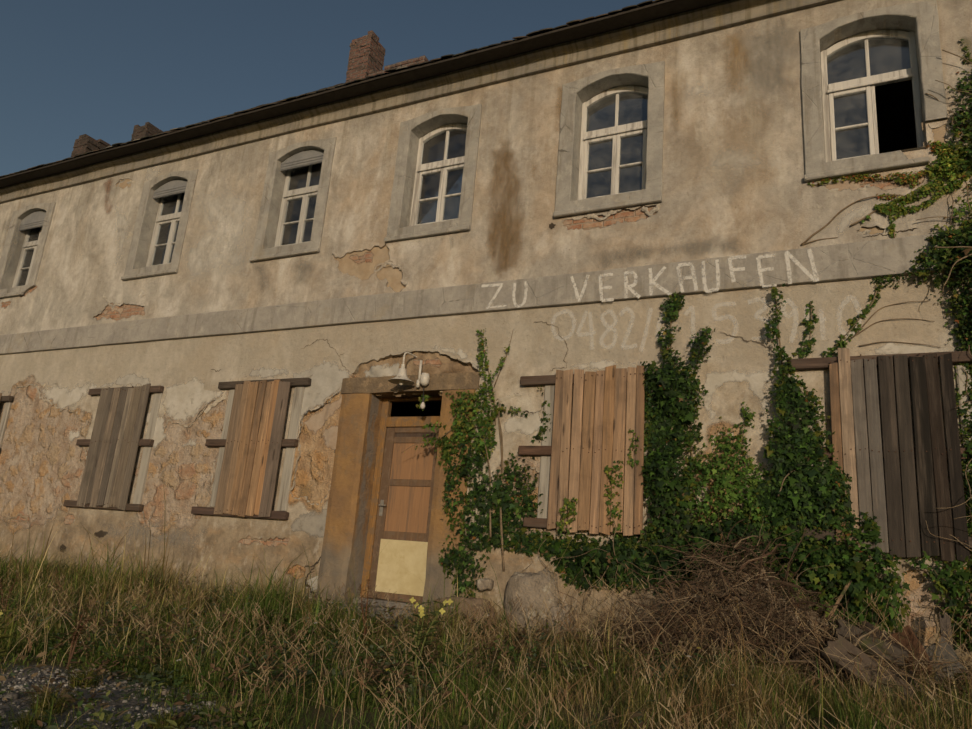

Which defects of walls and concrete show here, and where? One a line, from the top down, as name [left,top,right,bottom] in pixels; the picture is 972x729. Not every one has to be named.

flaking render [561,203,663,232]
flaking render [92,289,147,322]
flaking render [331,242,409,293]
crack [298,339,349,437]
flaking render [349,348,482,390]
flaking render [0,376,92,534]
flaking render [134,390,229,536]
flaking render [288,389,355,512]